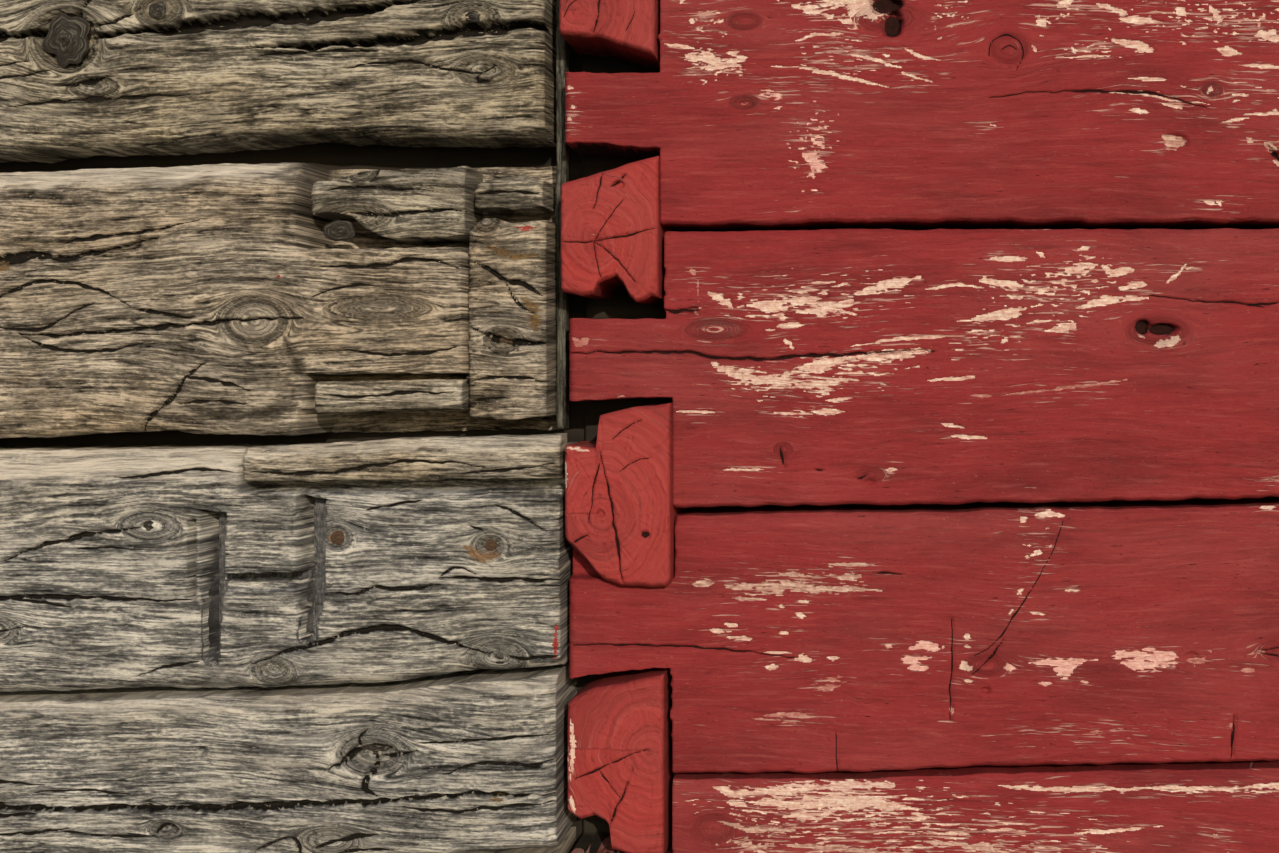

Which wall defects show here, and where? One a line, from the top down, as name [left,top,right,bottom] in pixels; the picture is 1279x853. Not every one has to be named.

crack [574,420,651,578]